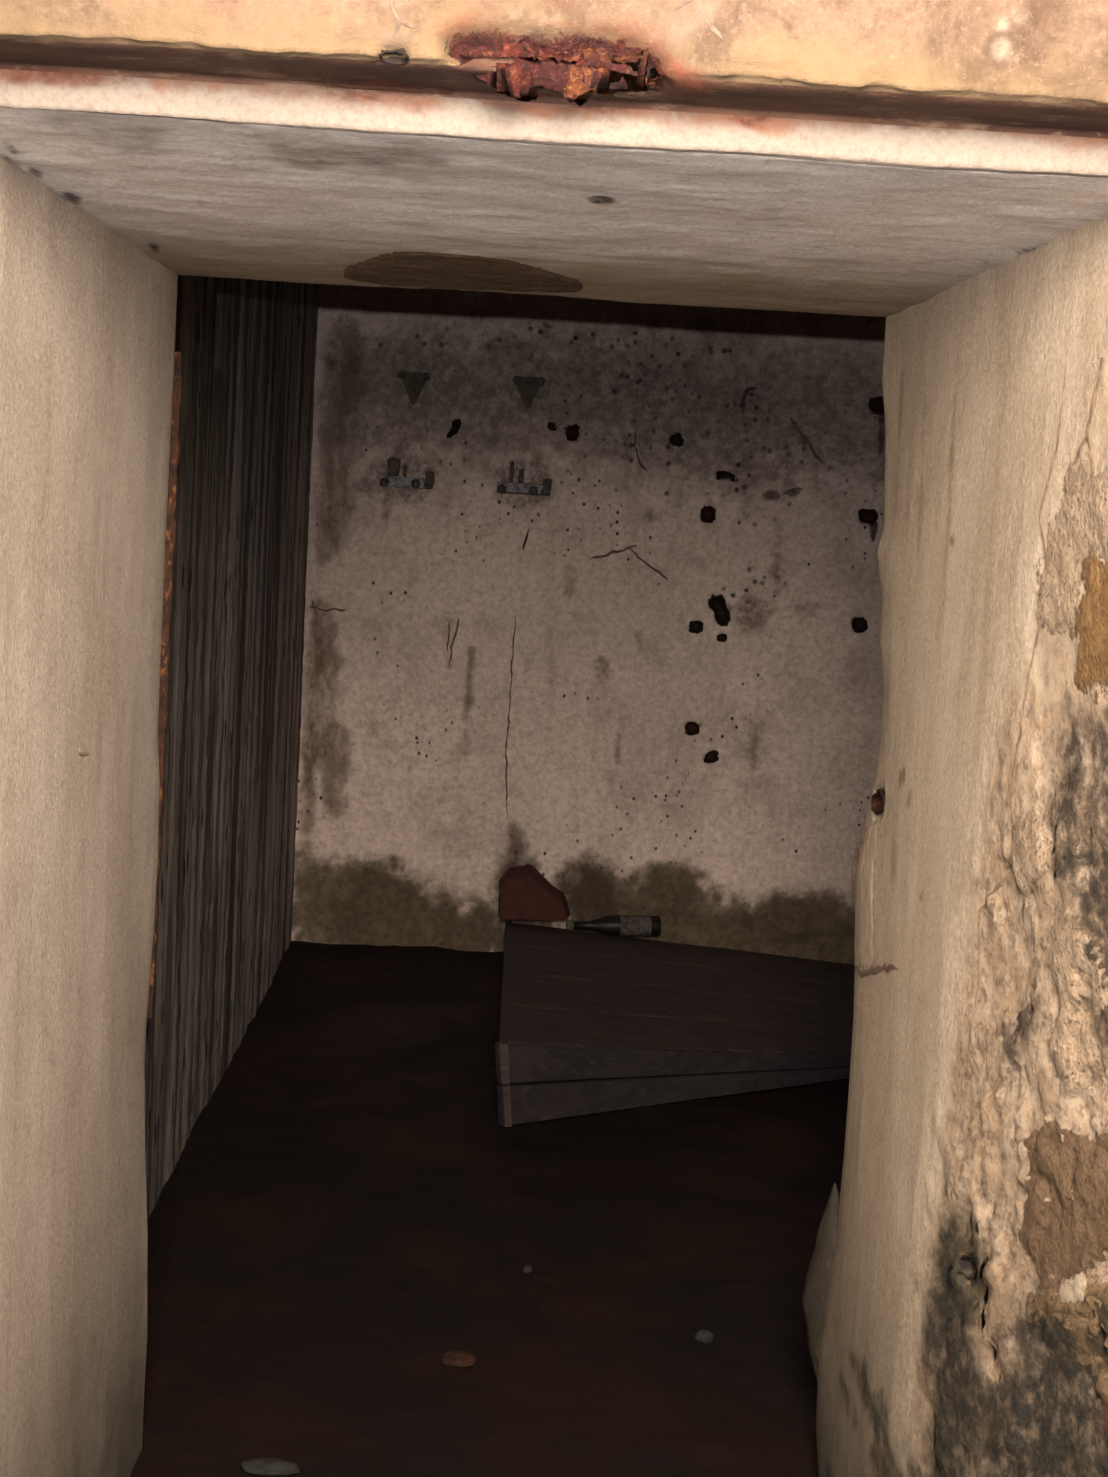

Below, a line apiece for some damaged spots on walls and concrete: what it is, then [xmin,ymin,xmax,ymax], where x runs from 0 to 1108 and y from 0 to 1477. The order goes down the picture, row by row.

spalling [1036,465,1108,704]
damp [292,829,855,965]
spalling [1009,776,1095,903]
spalling [1045,912,1108,1099]
damp [844,1359,902,1477]
damp [923,1217,1108,1477]
spalling [1018,1120,1108,1409]